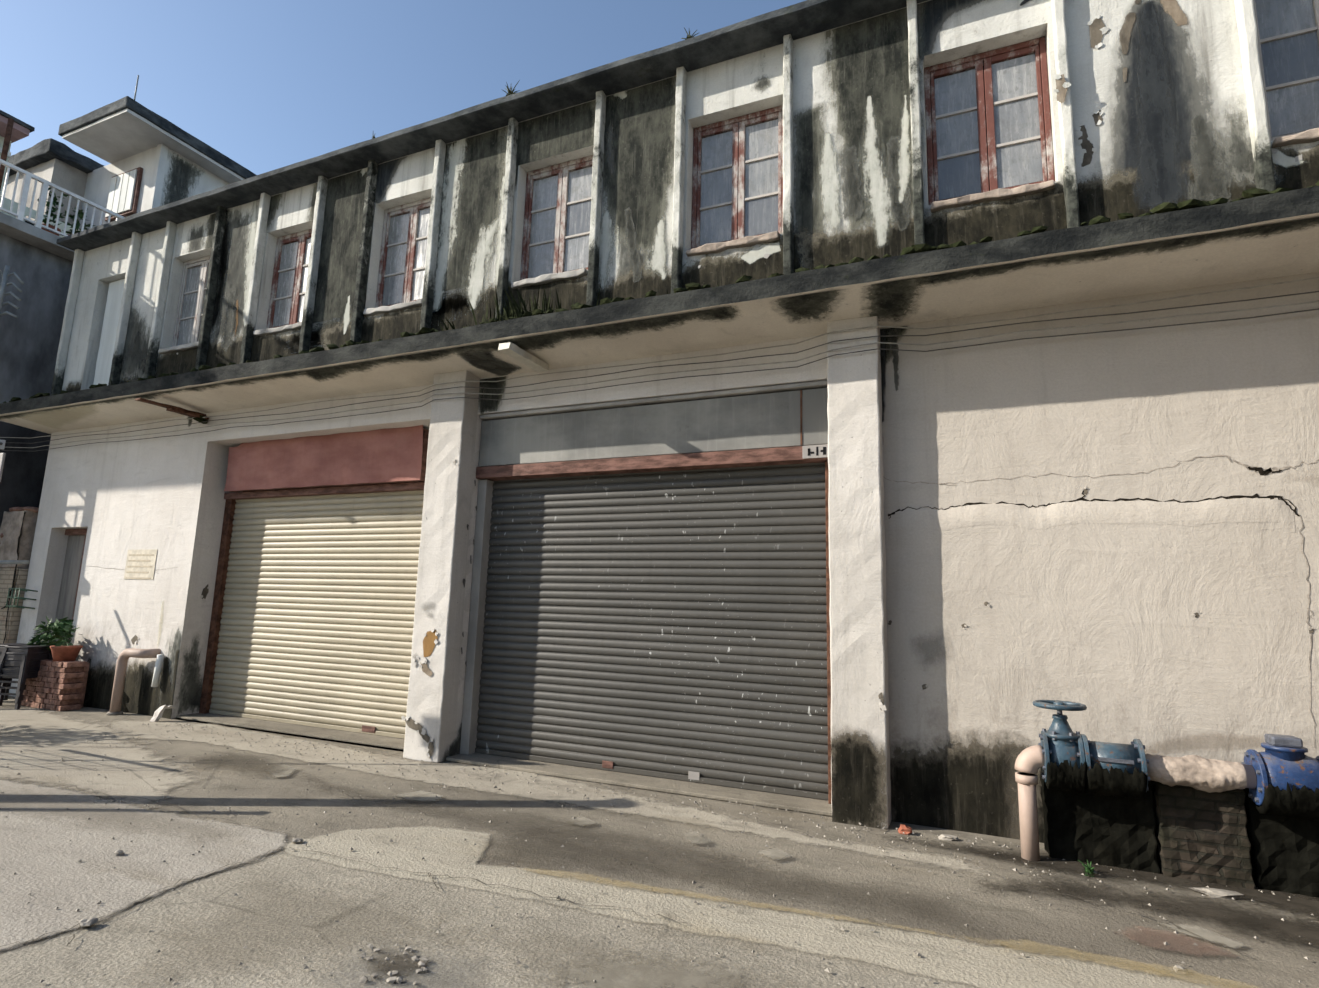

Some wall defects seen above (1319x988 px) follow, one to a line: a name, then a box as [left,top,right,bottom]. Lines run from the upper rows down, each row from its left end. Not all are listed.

water stain [291,156,407,345]
water stain [432,76,676,317]
water stain [793,0,982,247]
spalling [1074,109,1103,167]
water stain [1108,0,1254,209]
crack [884,455,1319,746]
water stain [885,836,1319,951]